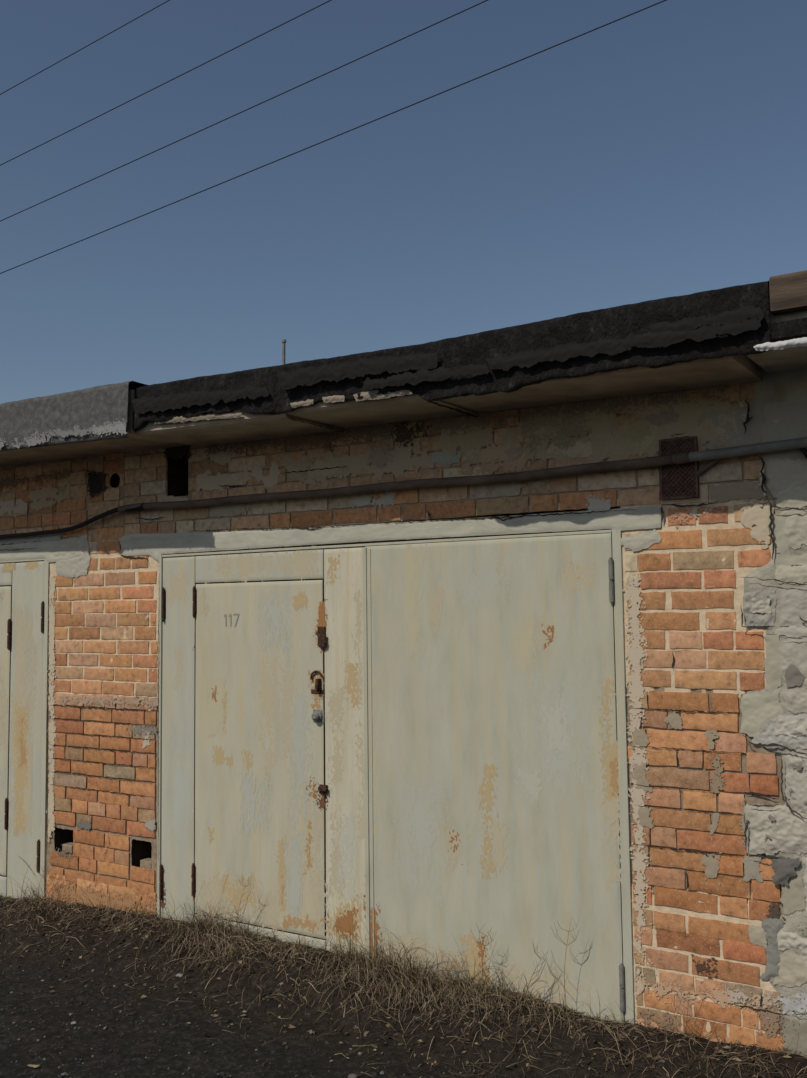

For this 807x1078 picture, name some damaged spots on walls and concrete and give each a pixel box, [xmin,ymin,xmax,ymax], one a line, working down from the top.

peeling [131,305,764,424]
corrosion [165,567,210,651]
corrosion [292,591,328,653]
corrosion [541,623,559,649]
spalling [785,664,805,688]
peeling [752,713,807,778]
corrosion [275,660,598,1011]